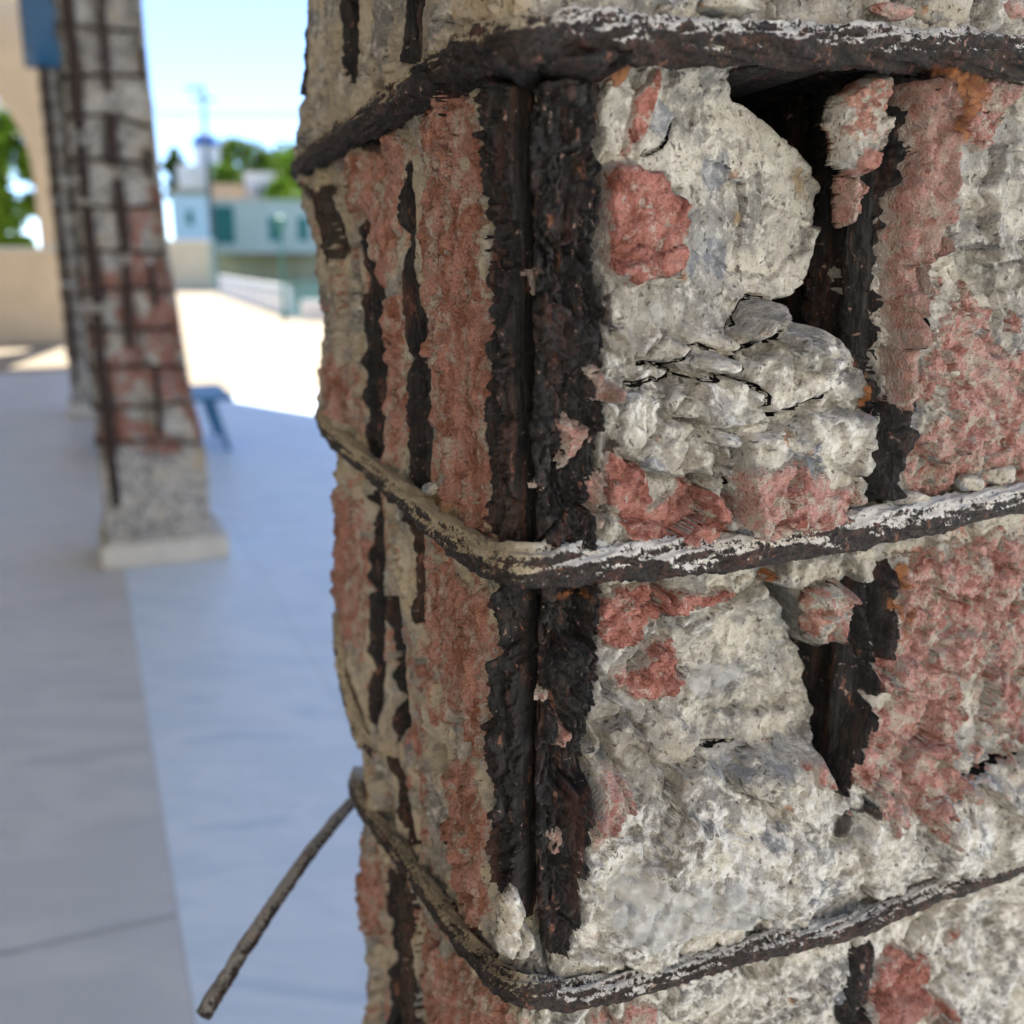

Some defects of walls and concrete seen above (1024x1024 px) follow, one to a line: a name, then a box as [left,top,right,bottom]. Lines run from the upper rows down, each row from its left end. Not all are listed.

spalling [40,66,122,507]
spalling [106,112,134,349]
spalling [317,65,1024,551]
crack [623,294,828,417]
corrosion [771,288,804,324]
corrosion [727,65,912,161]
corrosion [850,289,888,416]
corrosion [871,106,908,258]
spalling [329,477,1024,979]
corrosion [808,579,886,838]
flaking render [354,835,514,1024]
flaking render [834,938,962,1024]